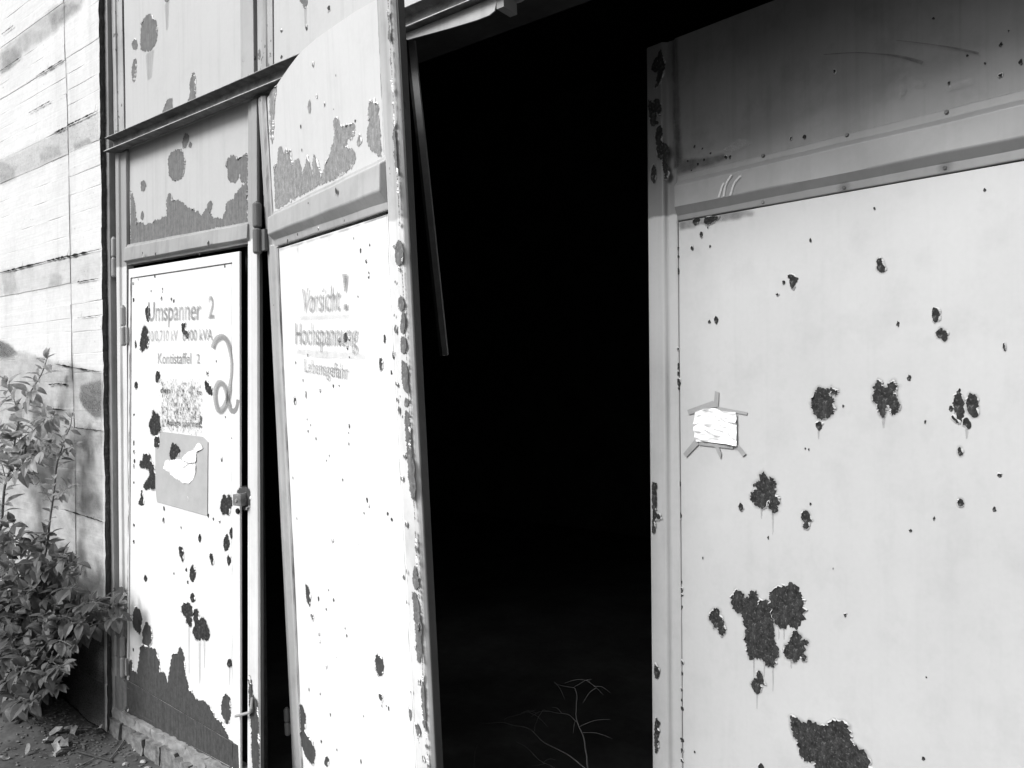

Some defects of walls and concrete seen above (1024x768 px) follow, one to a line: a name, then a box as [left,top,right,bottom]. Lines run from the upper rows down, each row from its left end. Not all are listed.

peeling [269,0,400,226]
corrosion [647,49,670,183]
peeling [79,0,248,768]